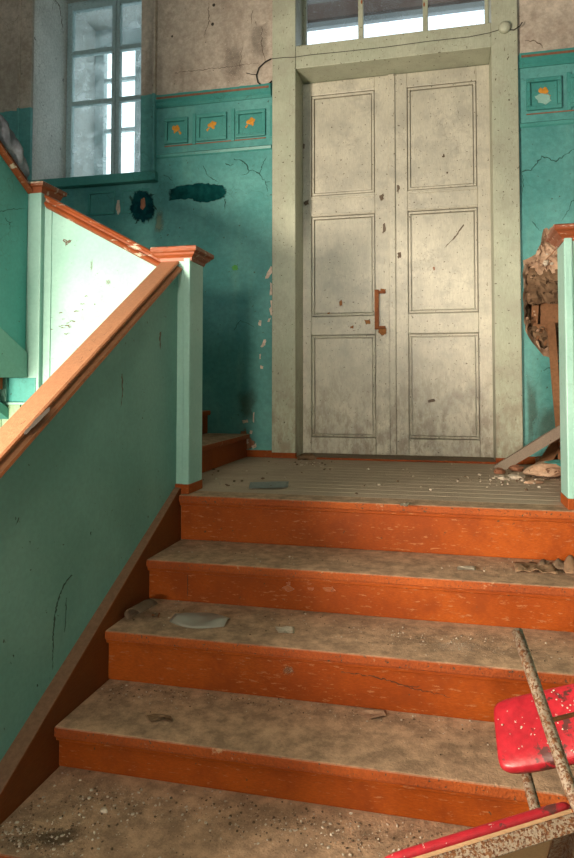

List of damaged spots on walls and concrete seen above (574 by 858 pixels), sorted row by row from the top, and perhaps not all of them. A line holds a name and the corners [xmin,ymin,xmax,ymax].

crack [183,11,265,72]
crack [203,159,270,191]
peeling [258,266,272,326]